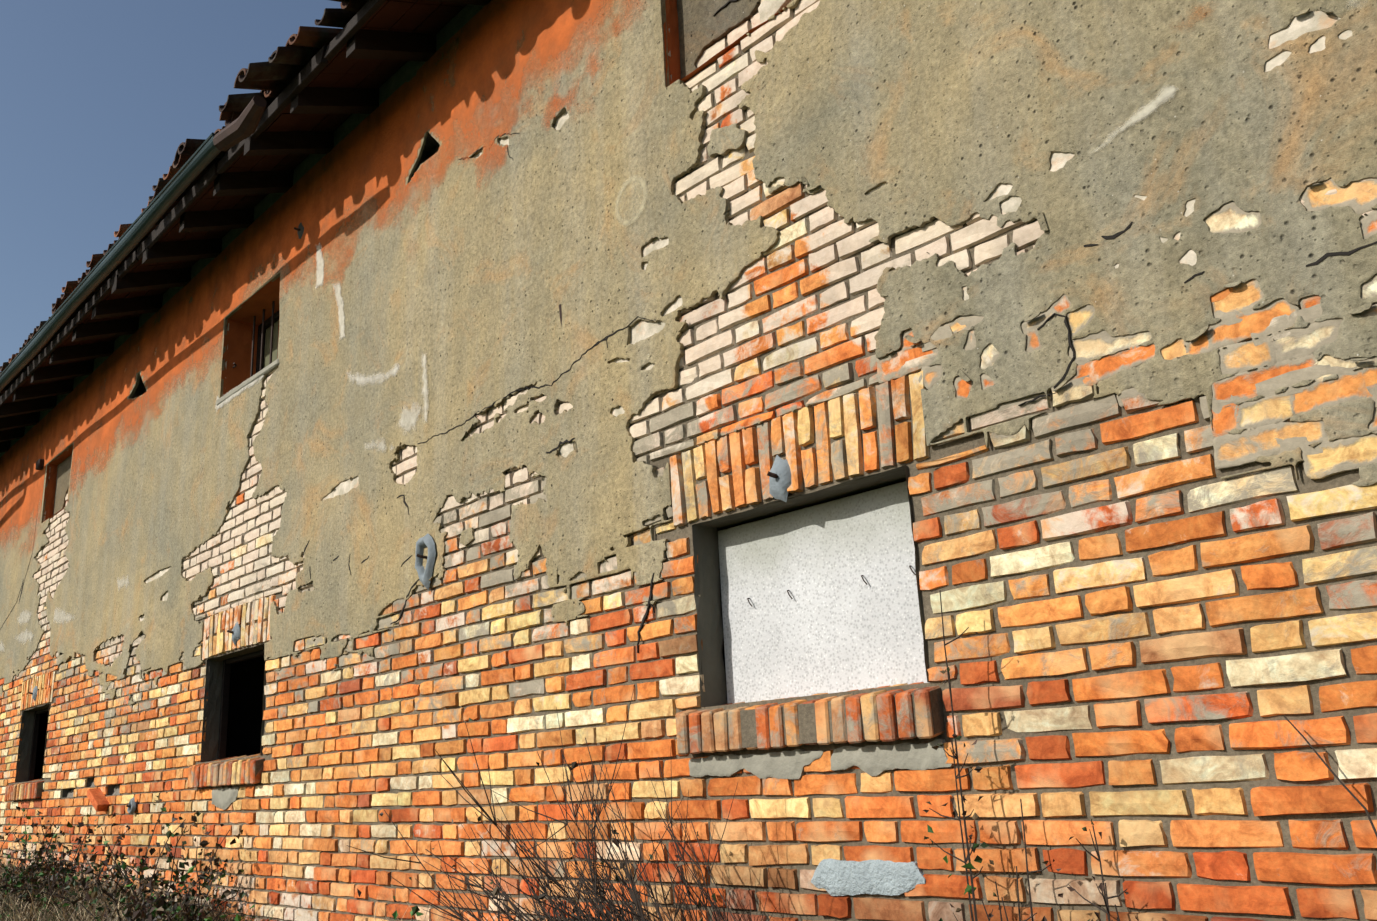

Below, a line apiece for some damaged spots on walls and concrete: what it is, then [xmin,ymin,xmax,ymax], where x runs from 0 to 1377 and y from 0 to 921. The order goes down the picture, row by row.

spalling [1264,7,1352,72]
spalling [1050,152,1075,172]
spalling [610,0,1049,477]
peeling [1160,198,1262,266]
peeling [1301,178,1377,239]
damp [216,375,264,409]
peeling [0,0,610,701]
crack [418,316,656,444]
peeling [1021,275,1377,480]